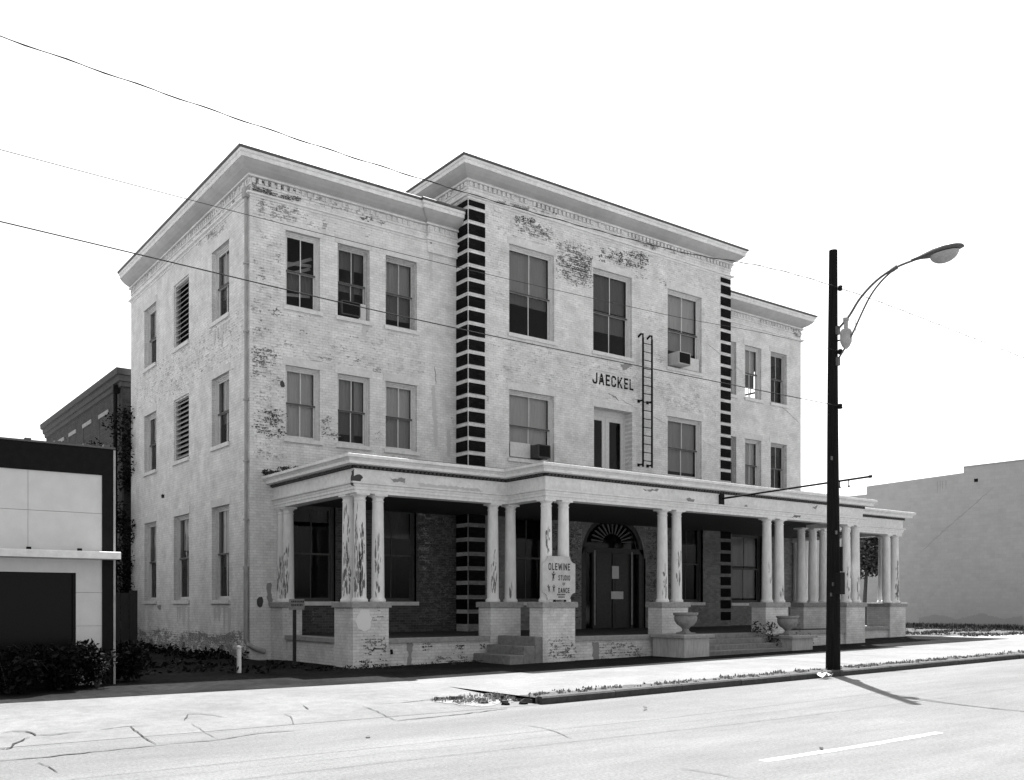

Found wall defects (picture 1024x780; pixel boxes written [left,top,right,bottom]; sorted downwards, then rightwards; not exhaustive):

peeling [486,200,719,311]
spalling [133,176,425,460]
peeling [277,547,289,599]
peeling [336,503,384,621]